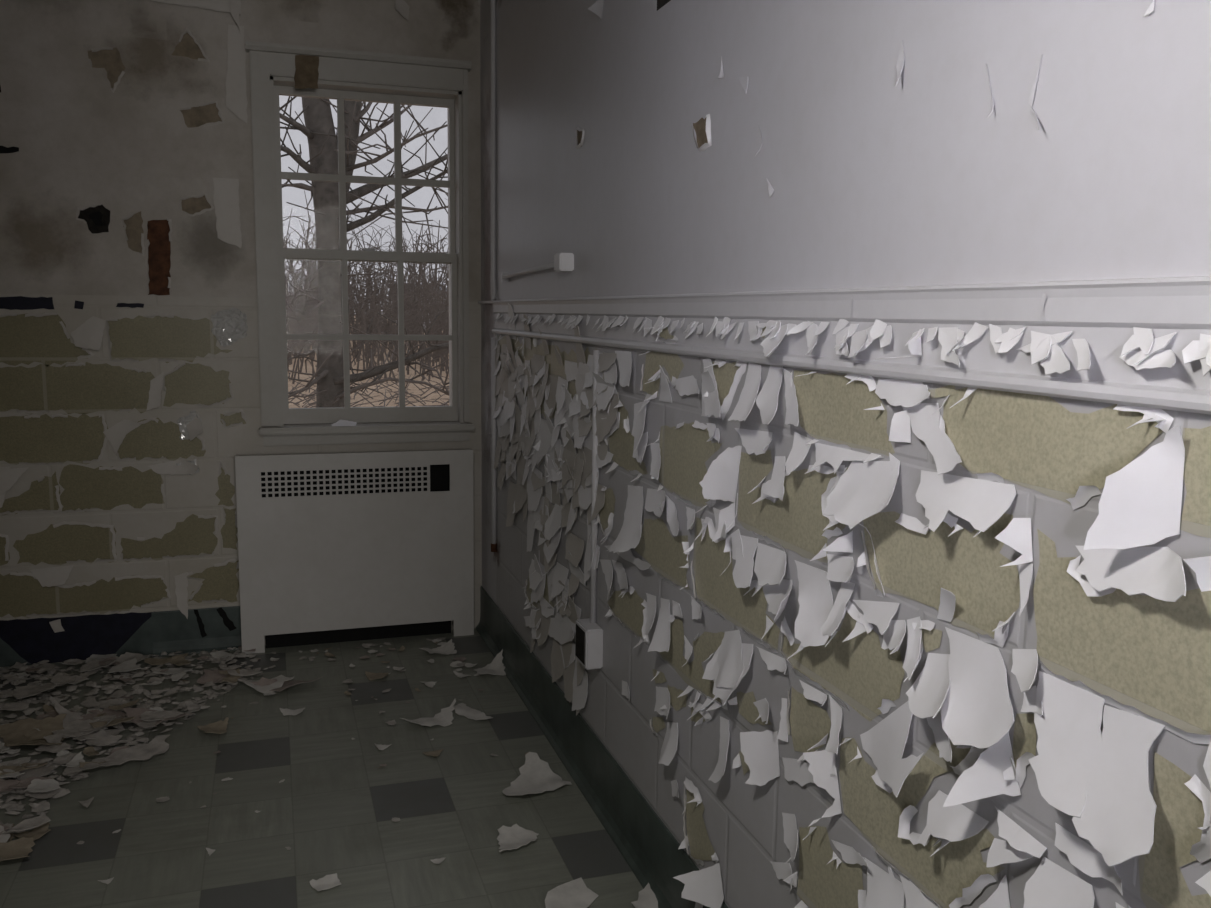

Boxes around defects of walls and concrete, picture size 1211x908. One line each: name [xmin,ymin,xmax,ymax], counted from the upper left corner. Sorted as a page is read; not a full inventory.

peeling [88,47,125,93]
peeling [0,313,246,619]
peeling [493,303,1211,908]